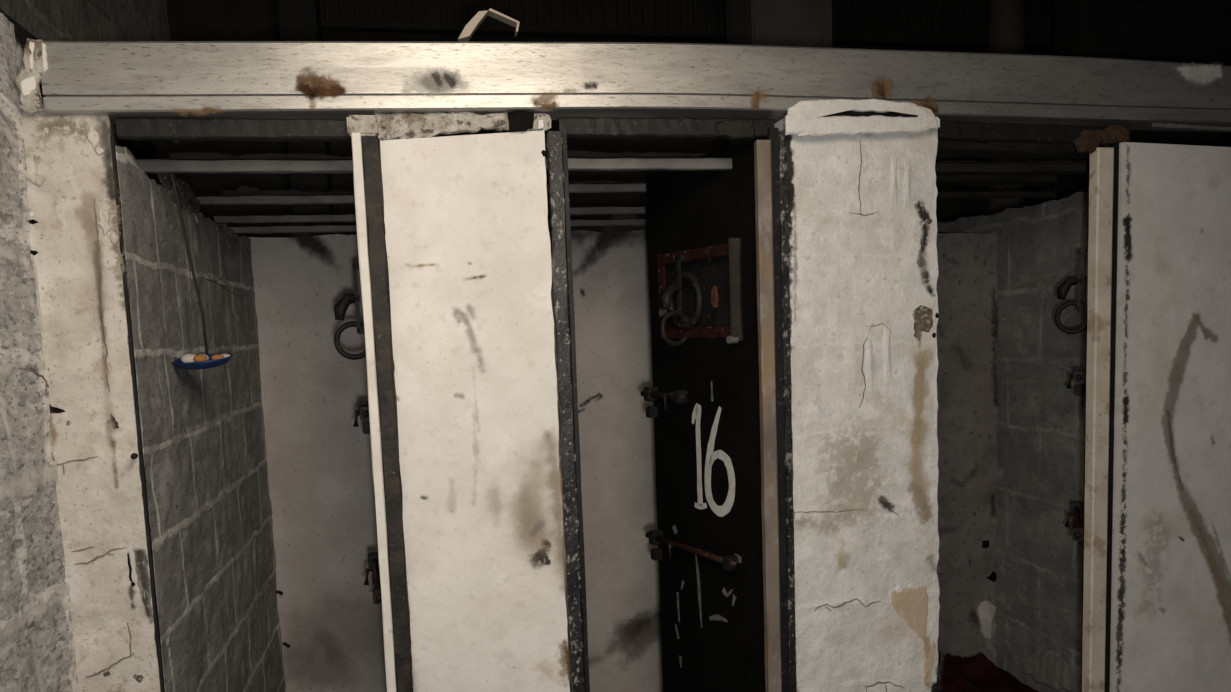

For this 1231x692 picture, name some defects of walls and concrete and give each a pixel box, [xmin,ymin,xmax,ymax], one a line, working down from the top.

corrosion [296,68,345,108]
corrosion [534,93,558,109]
corrosion [872,78,892,100]
peeling [1178,65,1222,84]
water stain [910,352,930,521]
water stain [551,471,562,519]
water stain [532,538,564,566]
crack [815,598,880,612]
peeling [891,583,944,692]